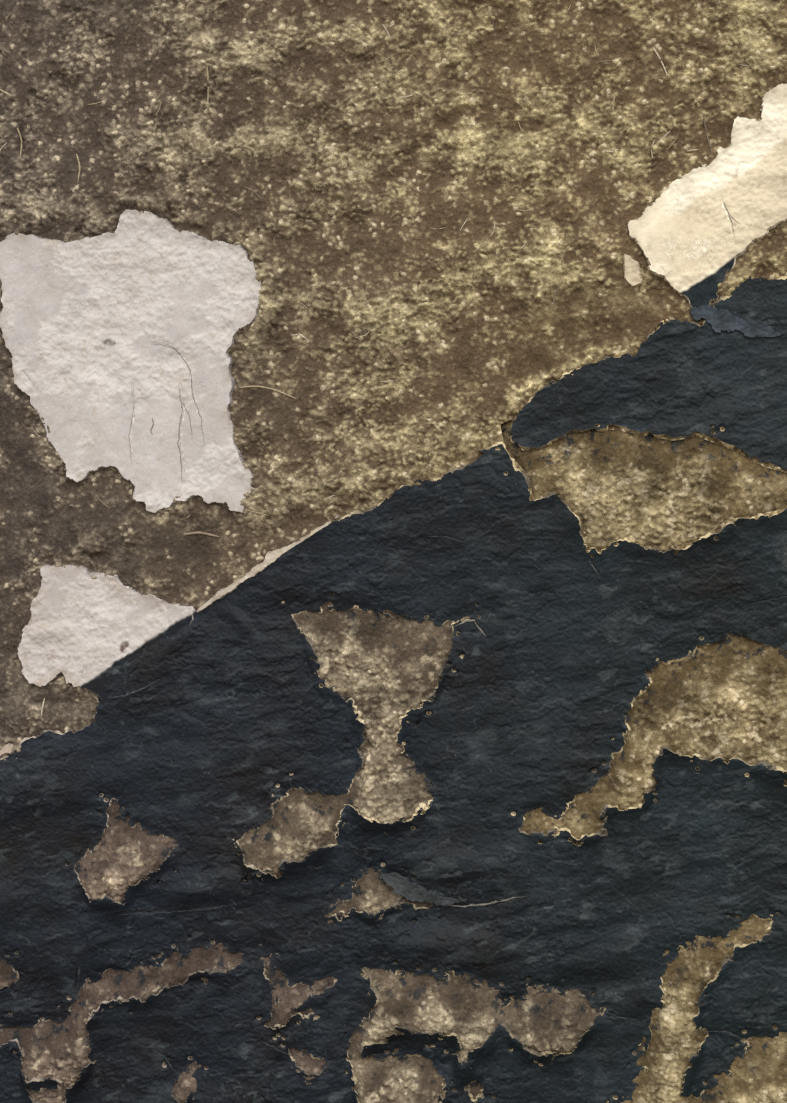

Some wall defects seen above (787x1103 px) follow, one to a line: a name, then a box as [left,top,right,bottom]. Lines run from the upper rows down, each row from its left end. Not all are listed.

spalling [0,0,787,761]
spalling [232,593,481,881]
spalling [511,632,787,846]
spalling [65,793,179,905]
spalling [0,936,244,1103]
spalling [256,944,337,1085]
spalling [345,961,606,1103]
spalling [606,913,787,1103]